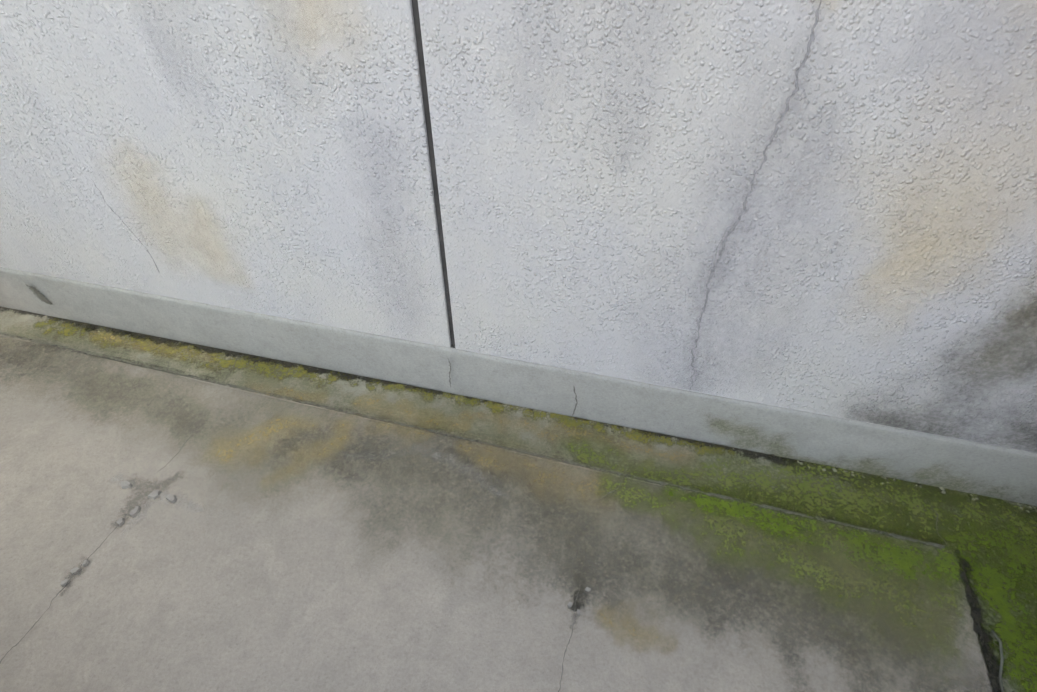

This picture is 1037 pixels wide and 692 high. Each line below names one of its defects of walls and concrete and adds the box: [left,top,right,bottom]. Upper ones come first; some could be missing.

crack [690,0,822,389]
crack [0,413,206,663]
crack [558,575,591,692]